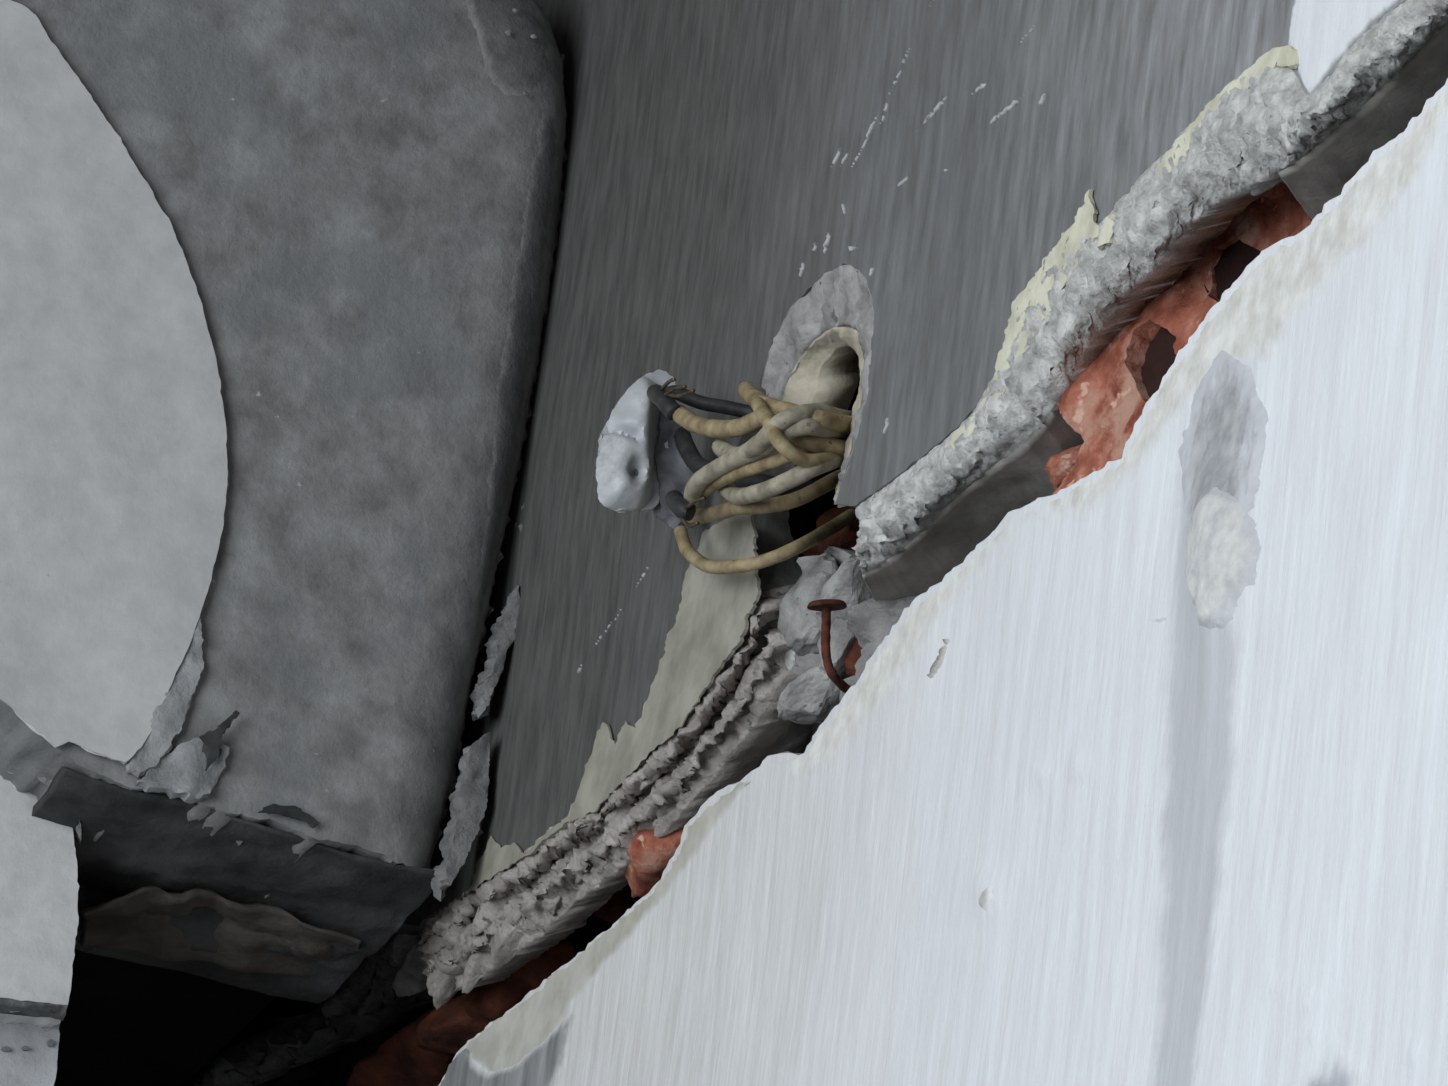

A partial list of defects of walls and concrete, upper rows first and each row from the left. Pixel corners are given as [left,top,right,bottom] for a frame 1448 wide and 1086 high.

spalling [32,619,435,1004]
spalling [345,0,1448,1086]